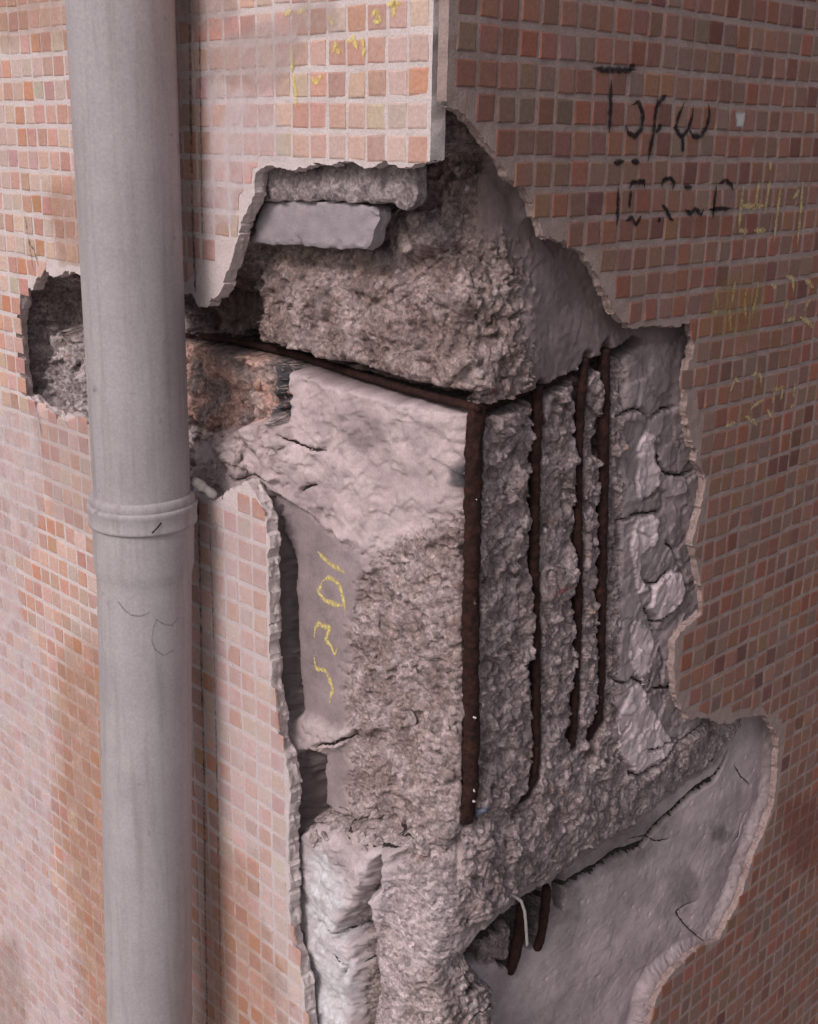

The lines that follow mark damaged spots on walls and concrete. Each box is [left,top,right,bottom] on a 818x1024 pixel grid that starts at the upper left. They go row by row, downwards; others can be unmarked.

spalling [27,274,89,417]
crack [282,438,327,452]
crack [616,453,687,520]
spalling [184,110,773,1024]
crack [632,542,673,633]
crack [612,677,669,689]
crack [531,760,750,897]
crack [474,921,496,939]